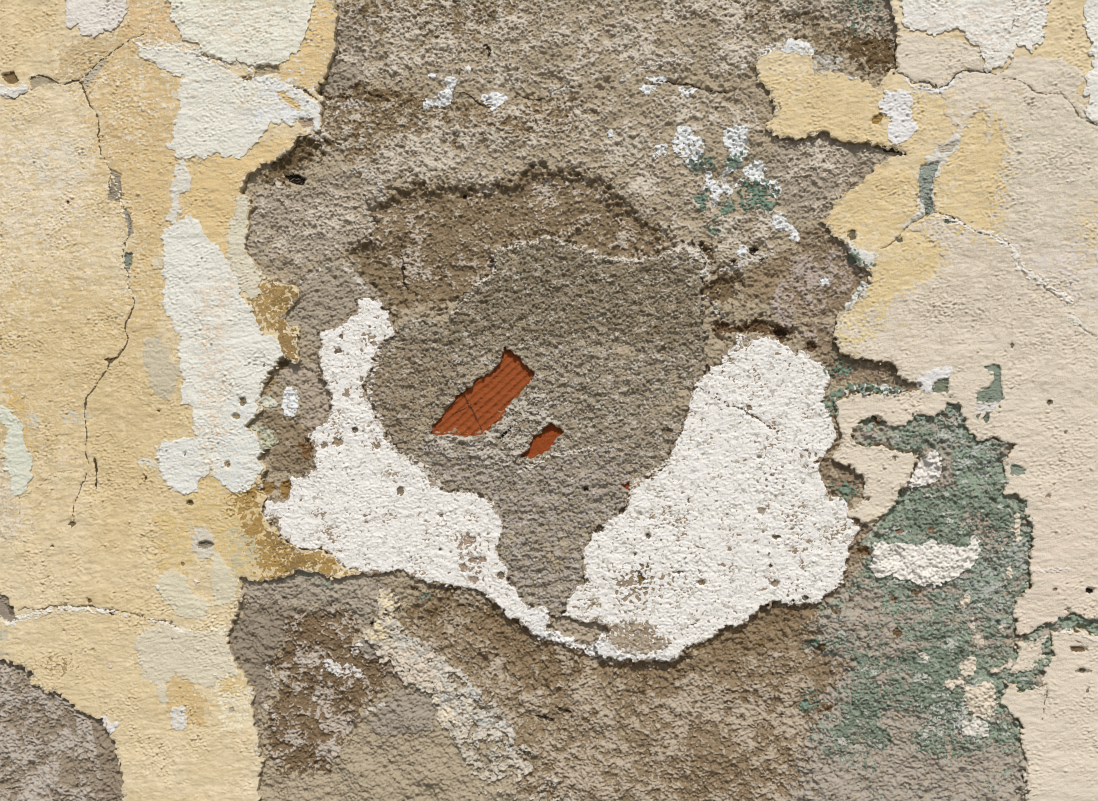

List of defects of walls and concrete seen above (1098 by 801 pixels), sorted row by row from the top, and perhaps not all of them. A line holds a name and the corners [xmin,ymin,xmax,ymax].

spalling [0,659,124,801]
crack [2,6,152,521]
crack [18,604,176,627]
spalling [229,0,1098,801]